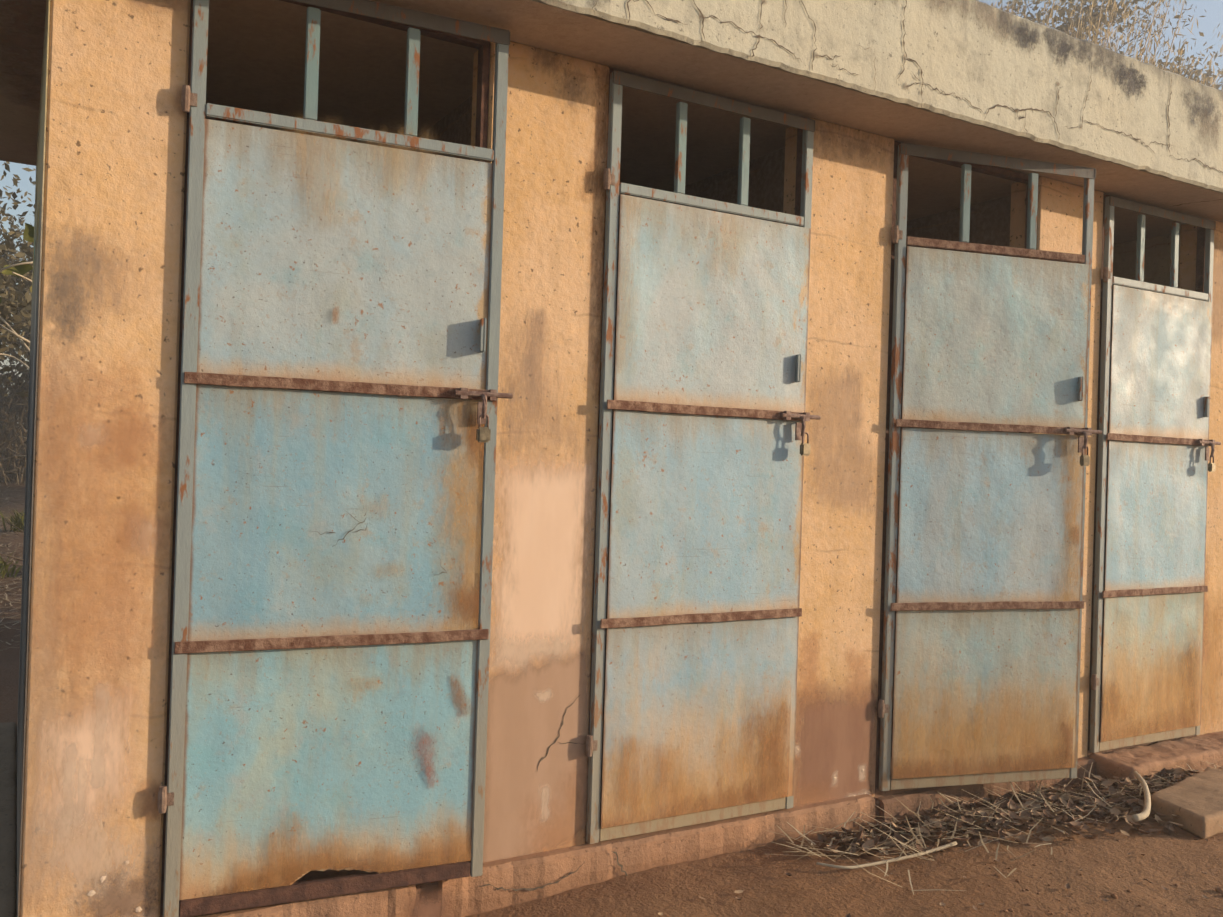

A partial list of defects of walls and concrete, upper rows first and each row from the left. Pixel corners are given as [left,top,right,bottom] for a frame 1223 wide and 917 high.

leakage [999,16,1145,94]
crack [627,0,1223,207]
leakage [1184,91,1214,124]
leakage [17,282,38,794]
leakage [42,685,131,834]
crack [537,695,586,772]
corrosion [1102,652,1200,742]
corrosion [224,843,470,894]